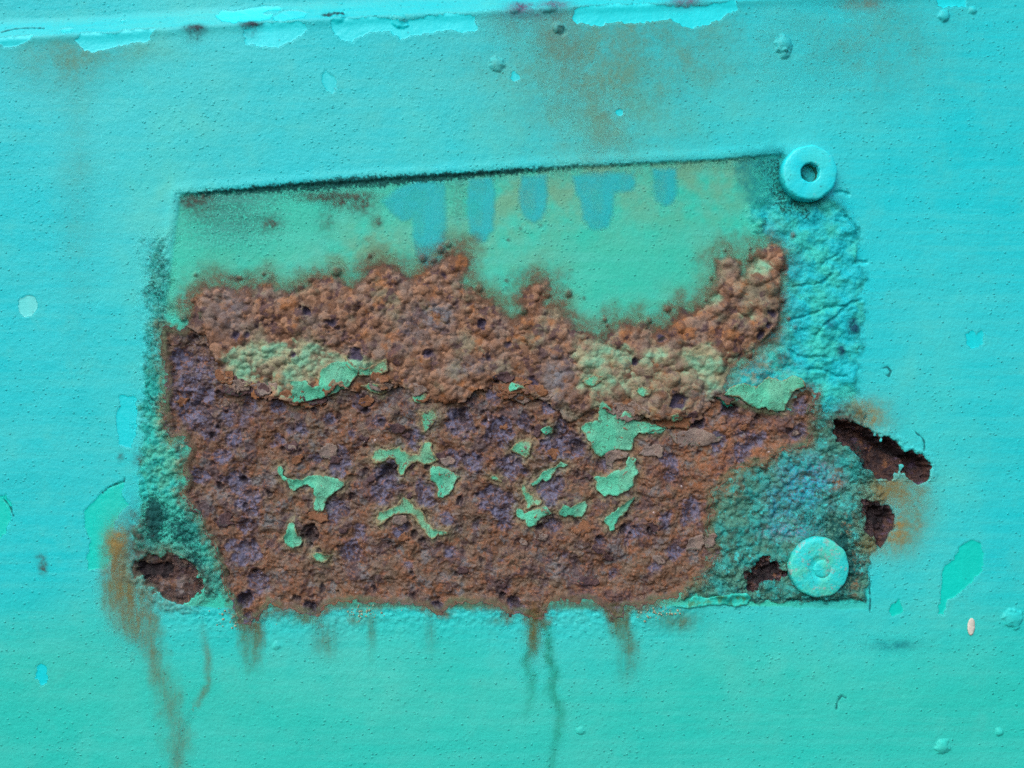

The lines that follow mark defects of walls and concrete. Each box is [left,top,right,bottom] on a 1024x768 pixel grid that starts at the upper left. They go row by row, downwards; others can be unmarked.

peeling [61,28,155,53]
peeling [216,5,307,48]
peeling [331,13,478,42]
peeling [572,0,738,29]
rust [159,237,885,649]
rust [107,530,157,657]
peeling [938,540,984,615]